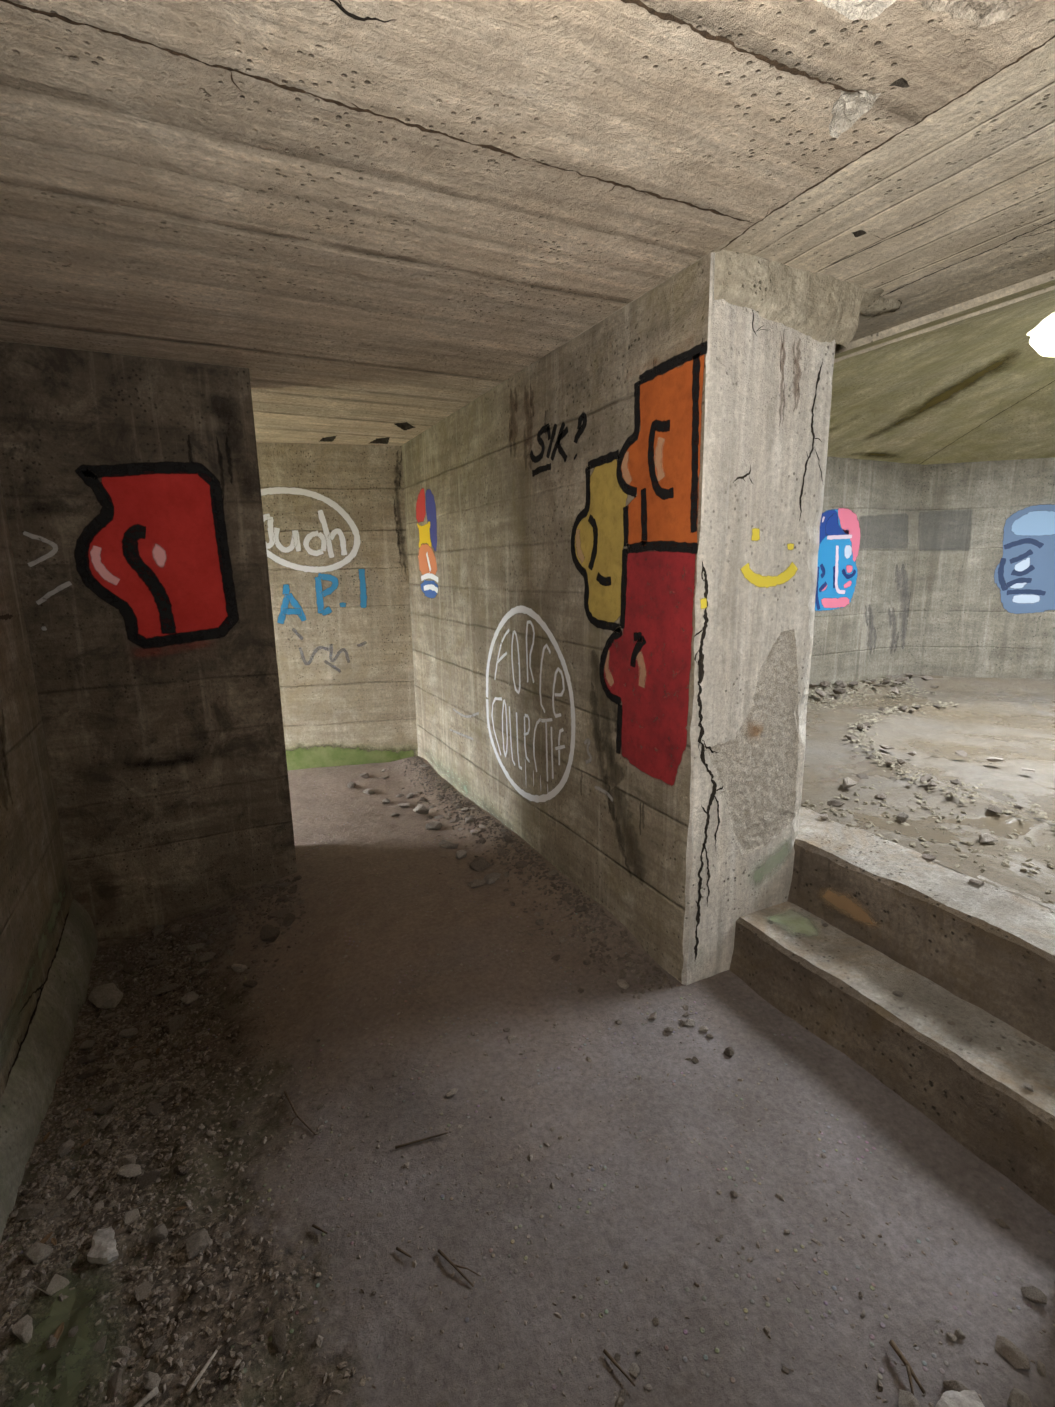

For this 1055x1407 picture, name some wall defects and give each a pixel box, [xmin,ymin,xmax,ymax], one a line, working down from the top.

crack [0,0,1055,251]
spalling [817,0,897,20]
spalling [916,0,1034,28]
crack [694,561,723,960]
spalling [705,628,799,855]